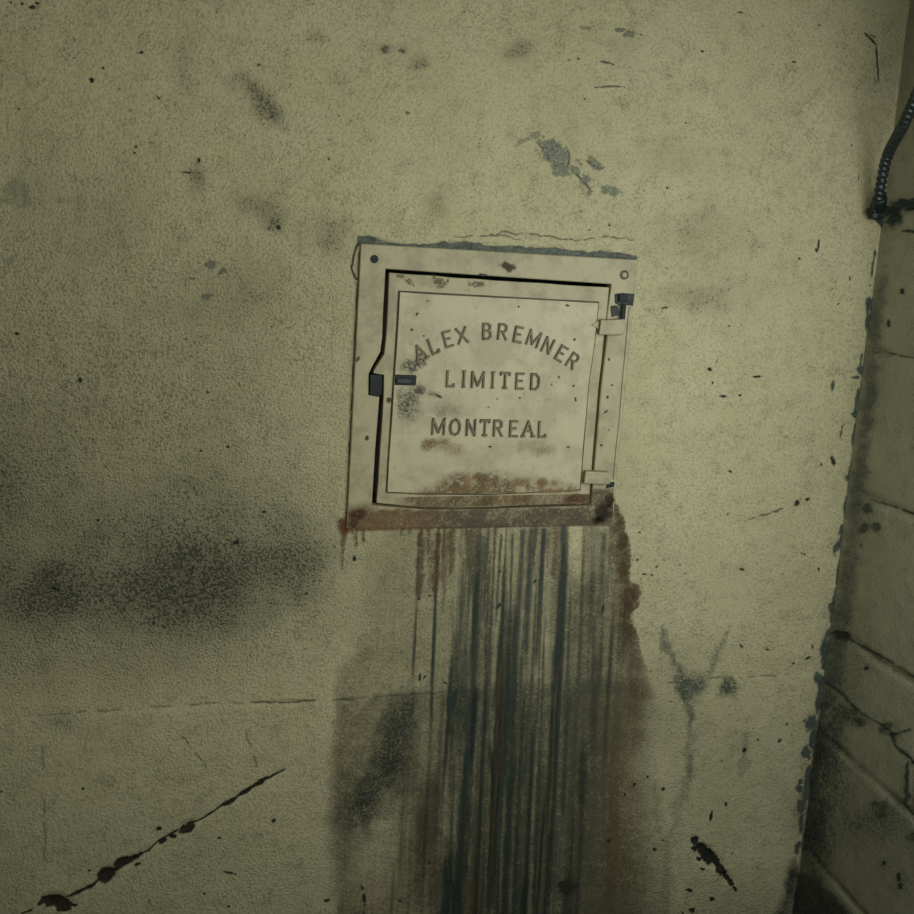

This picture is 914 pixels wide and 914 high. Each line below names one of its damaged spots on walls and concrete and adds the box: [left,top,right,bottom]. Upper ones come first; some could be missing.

corrosion [339,473,641,653]
crack [22,759,285,914]
leakage [336,526,645,914]
leakage [779,866,848,914]
crack [827,682,914,840]
crack [832,631,914,677]